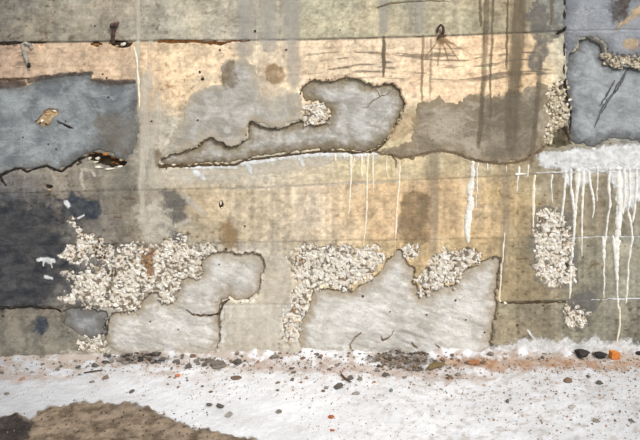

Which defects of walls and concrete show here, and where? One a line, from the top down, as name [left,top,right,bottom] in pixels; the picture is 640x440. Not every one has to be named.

peeling [0,71,140,174]
damp [0,0,429,245]
peeling [161,58,331,158]
peeling [381,77,572,165]
damp [505,0,563,139]
peeling [563,0,640,128]
damp [0,191,102,311]
spalling [57,215,218,315]
crack [186,299,230,317]
spalling [278,241,386,349]
damp [464,161,479,244]
damp [489,89,640,353]